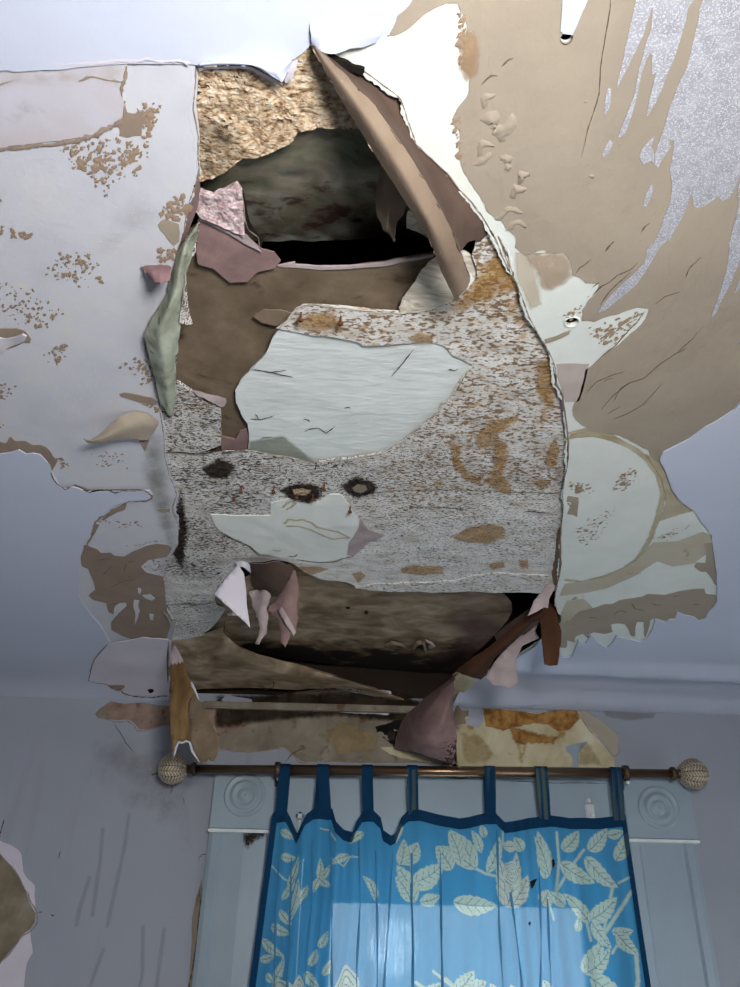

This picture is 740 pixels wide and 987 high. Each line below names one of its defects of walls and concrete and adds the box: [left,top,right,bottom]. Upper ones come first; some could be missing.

peeling [335,0,740,657]
peeling [0,57,202,698]
rust [451,417,517,493]
rust [547,442,558,468]
leakage [341,478,378,498]
rust [455,525,504,543]
leakage [216,692,421,727]
spalling [218,708,615,768]
spalling [453,672,475,701]
spalling [0,841,38,987]